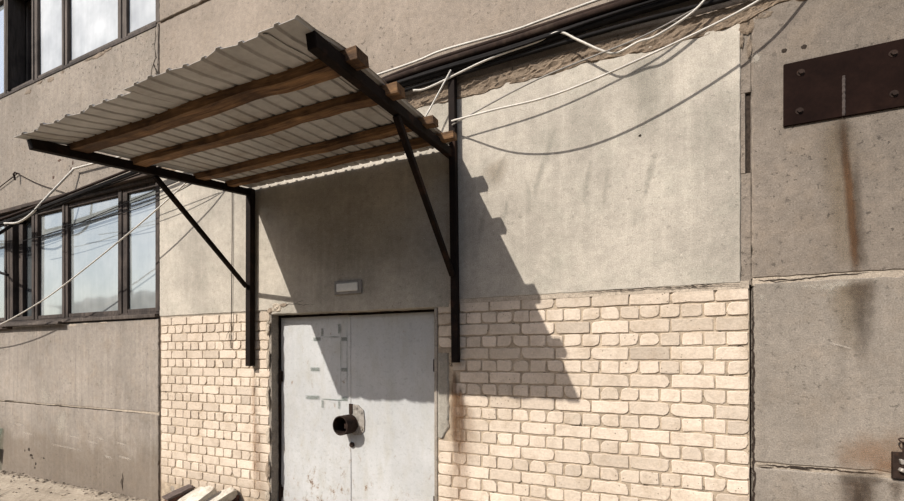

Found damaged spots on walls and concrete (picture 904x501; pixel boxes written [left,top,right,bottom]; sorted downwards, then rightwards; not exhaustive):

corrosion [844,144,857,260]